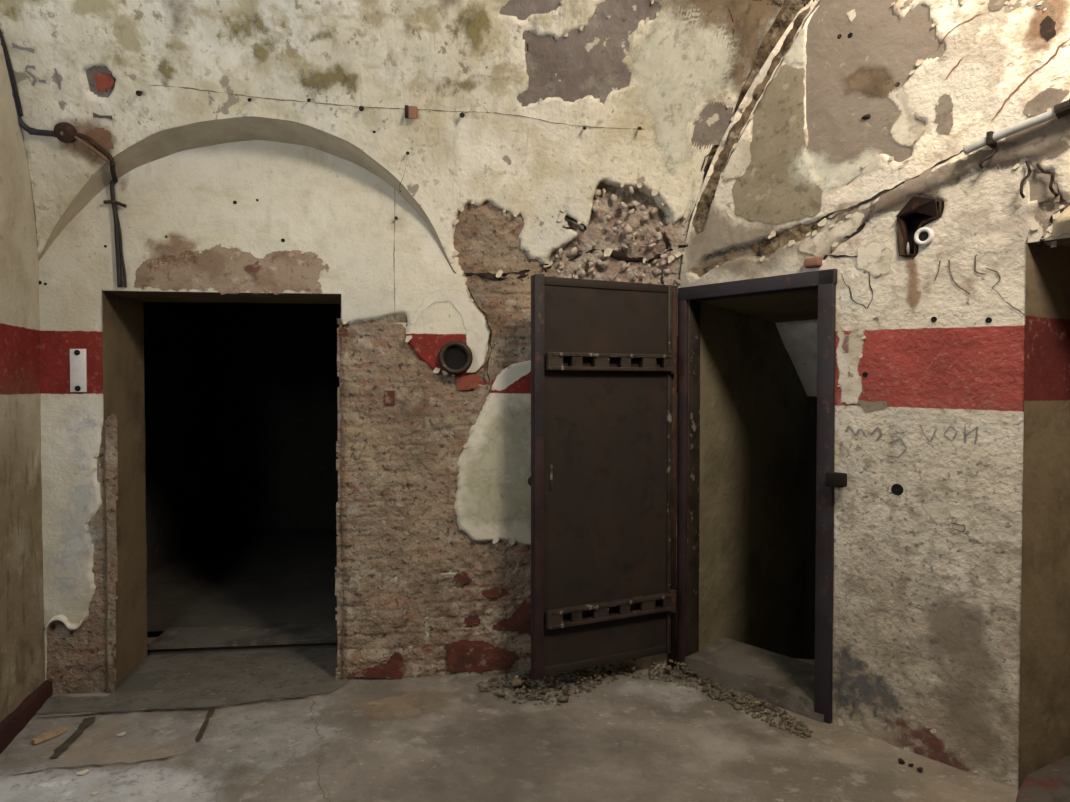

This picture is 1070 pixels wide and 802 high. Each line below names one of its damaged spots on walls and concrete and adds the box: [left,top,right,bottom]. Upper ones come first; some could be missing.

crack [729,0,783,38]
crack [701,148,713,181]
spalling [135,238,329,295]
crack [702,250,728,268]
crack [816,150,963,308]
spalling [335,0,1070,681]
spalling [45,414,118,694]
leakage [832,649,899,717]
leakage [930,595,994,738]